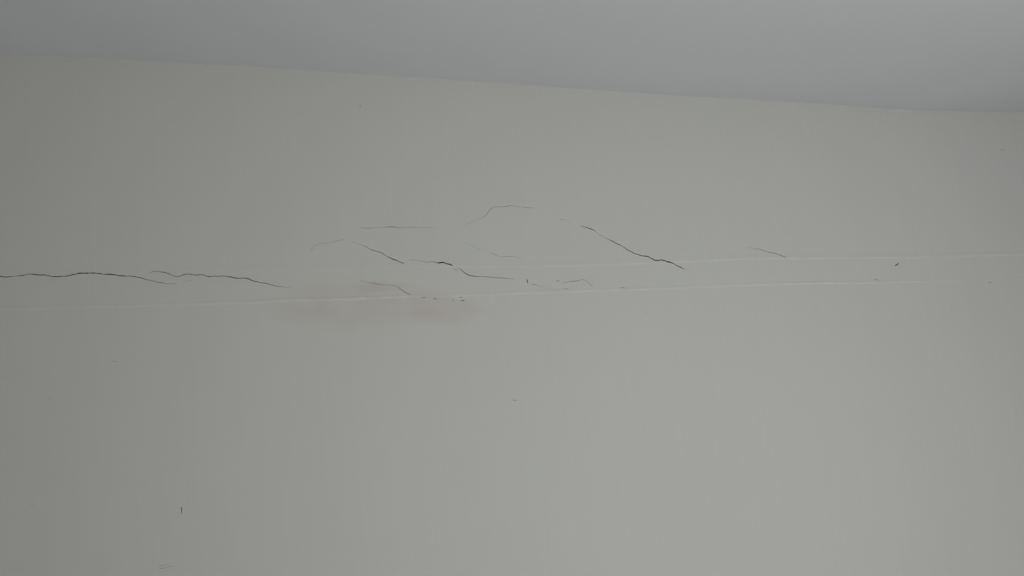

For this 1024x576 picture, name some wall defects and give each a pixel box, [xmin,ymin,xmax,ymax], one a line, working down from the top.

crack [0,271,282,287]
crack [360,244,520,294]
crack [563,219,684,269]